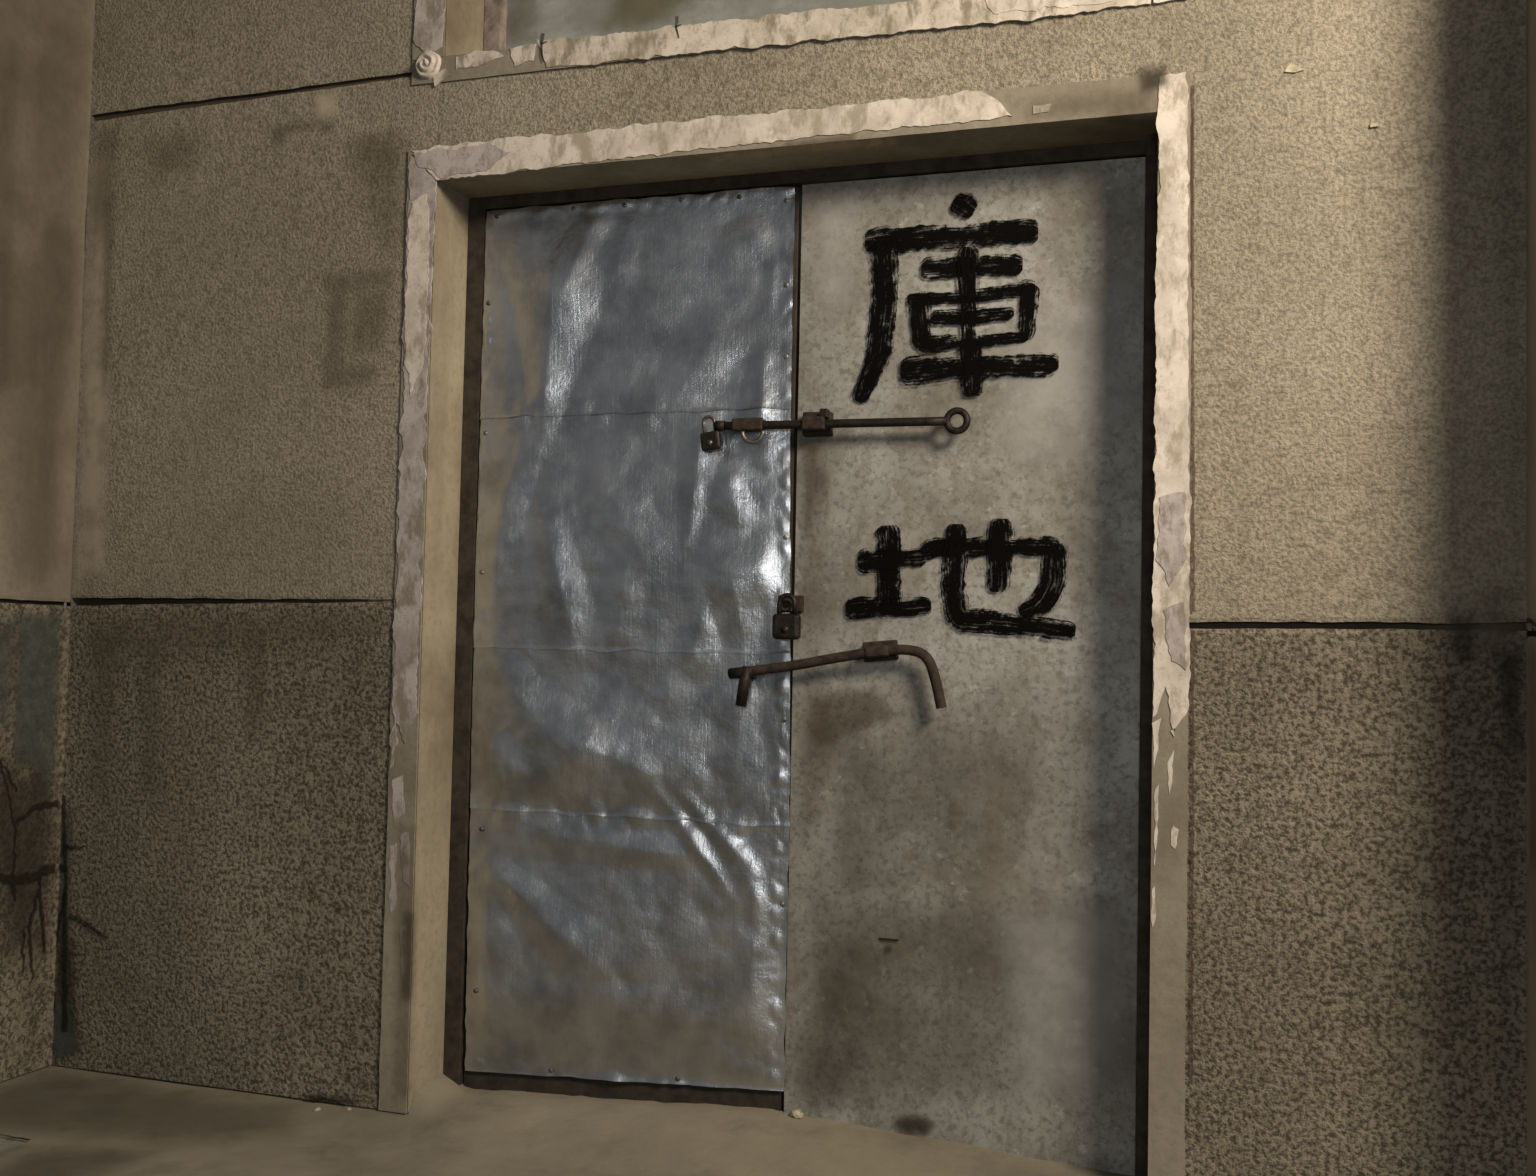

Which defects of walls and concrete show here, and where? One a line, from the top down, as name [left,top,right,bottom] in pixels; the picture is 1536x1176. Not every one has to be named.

peeling [1152,71,1192,866]
damp [0,617,57,796]
crack [0,759,108,1032]
damp [56,814,77,1055]